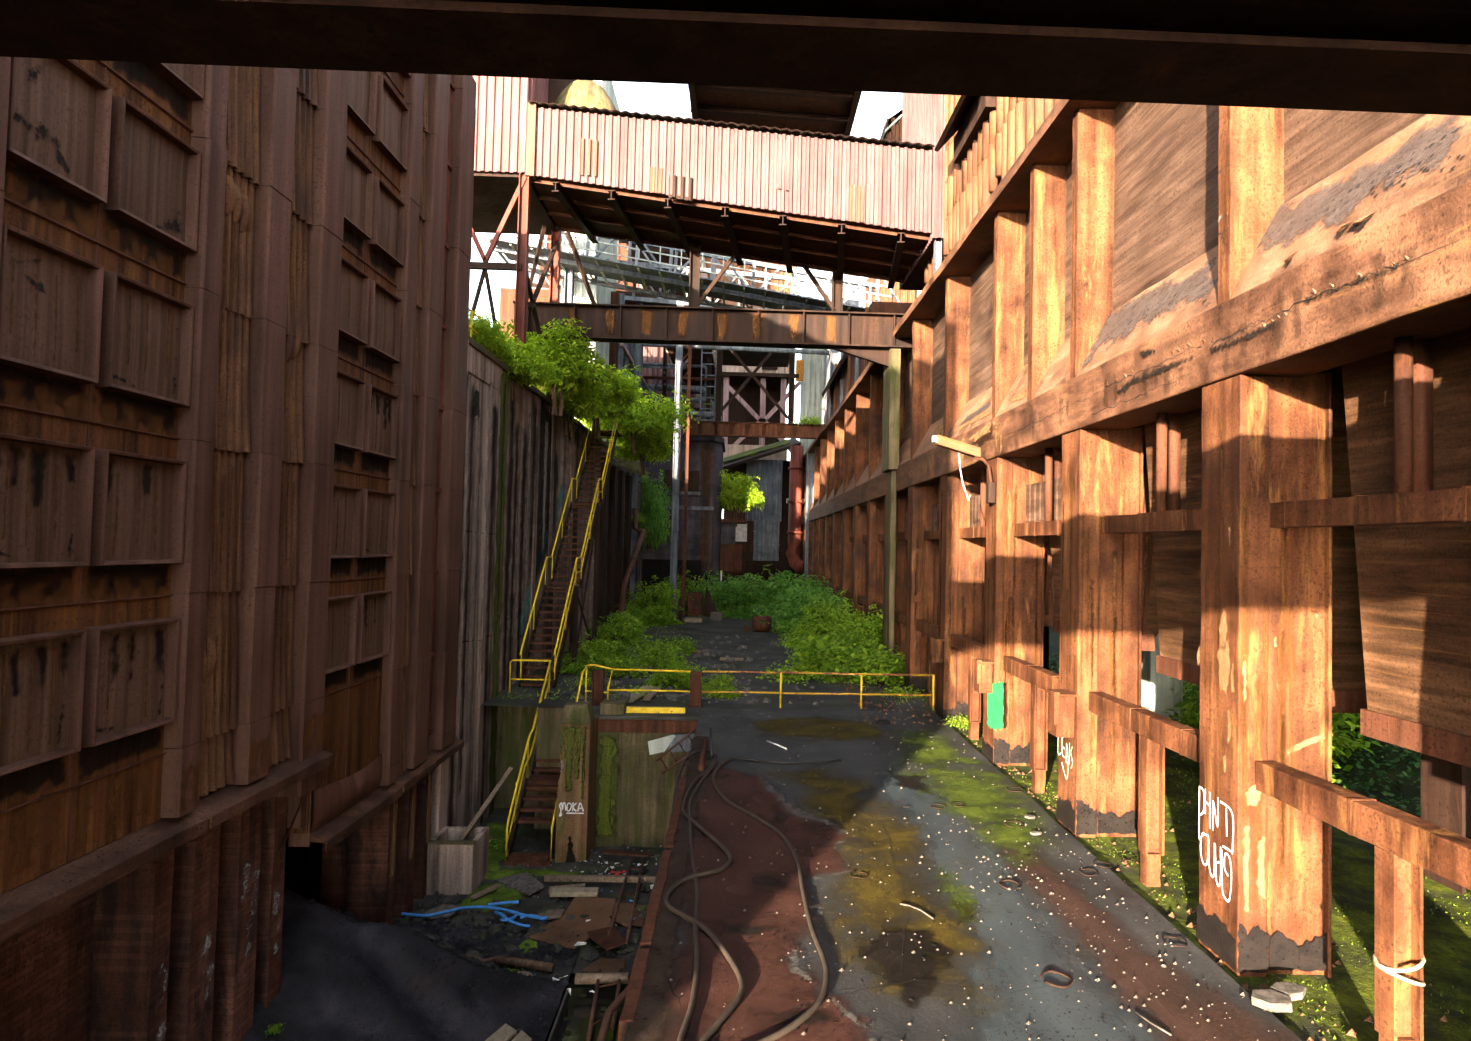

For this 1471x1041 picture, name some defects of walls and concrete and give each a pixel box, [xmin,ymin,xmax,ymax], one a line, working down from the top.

peeling [1258,115,1467,267]
peeling [1082,258,1218,367]
spalling [1107,312,1287,394]
leakage [875,772,1265,1041]